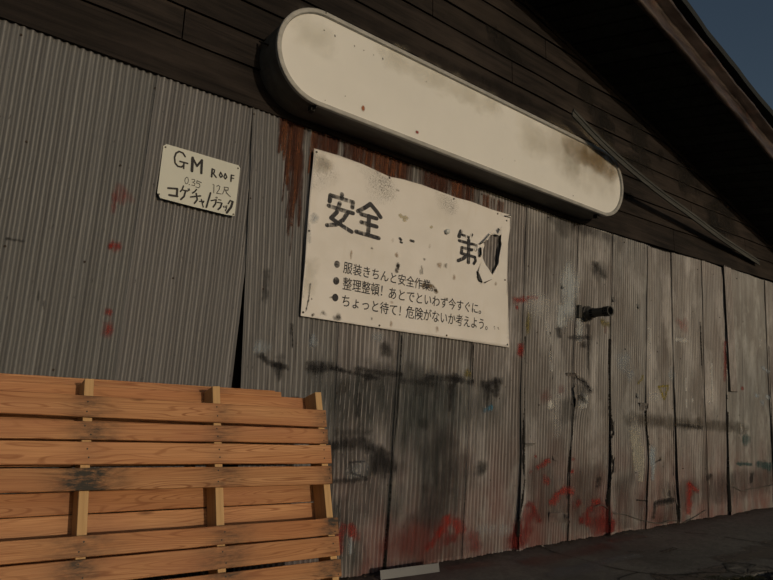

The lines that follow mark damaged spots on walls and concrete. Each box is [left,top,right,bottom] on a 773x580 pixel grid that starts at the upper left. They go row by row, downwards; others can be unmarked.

rust [278,118,409,253]
rust [425,169,475,202]
rust [483,195,504,213]